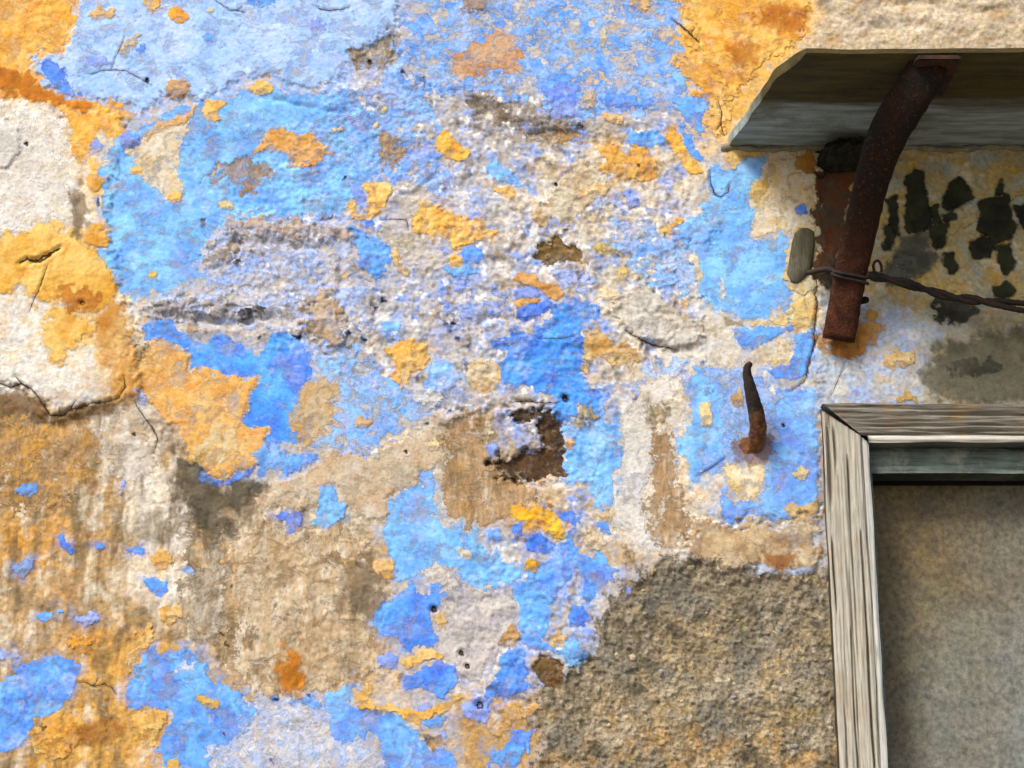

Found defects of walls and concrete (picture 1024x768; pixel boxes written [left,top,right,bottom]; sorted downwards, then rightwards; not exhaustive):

corrosion [795,150,856,281]
water stain [881,169,1024,299]
crack [20,248,61,309]
peeling [0,0,827,685]
corrosion [812,310,882,360]
water stain [930,298,980,325]
water stain [918,326,1024,404]
crack [0,376,158,452]
spalling [484,551,838,768]